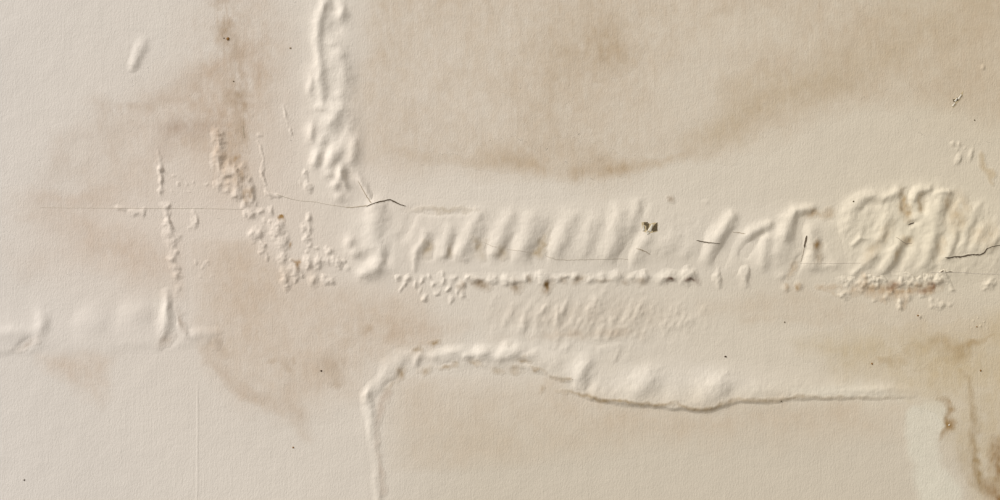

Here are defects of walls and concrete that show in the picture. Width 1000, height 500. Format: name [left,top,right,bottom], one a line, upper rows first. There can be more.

damp [358,0,1000,197]
crack [277,183,405,208]
damp [0,0,480,447]
damp [469,234,511,264]
damp [525,224,553,263]
peeling [642,222,658,235]
damp [811,237,826,268]
damp [799,204,839,222]
crack [931,245,1000,274]
damp [373,257,1000,500]